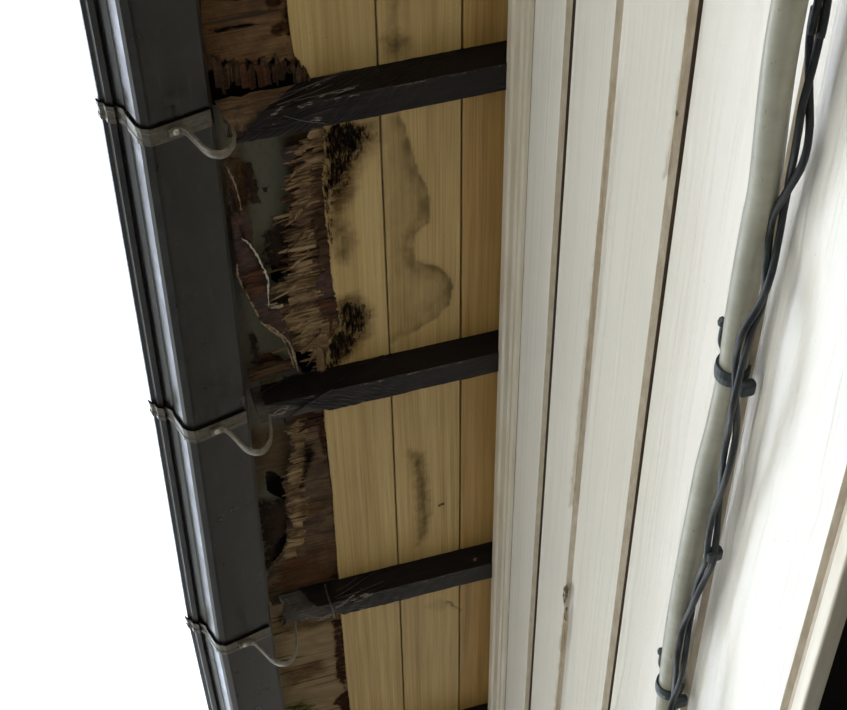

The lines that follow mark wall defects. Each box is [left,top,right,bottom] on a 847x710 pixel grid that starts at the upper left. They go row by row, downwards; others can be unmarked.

water stain [319,122,371,259]
peeling [315,267,334,309]